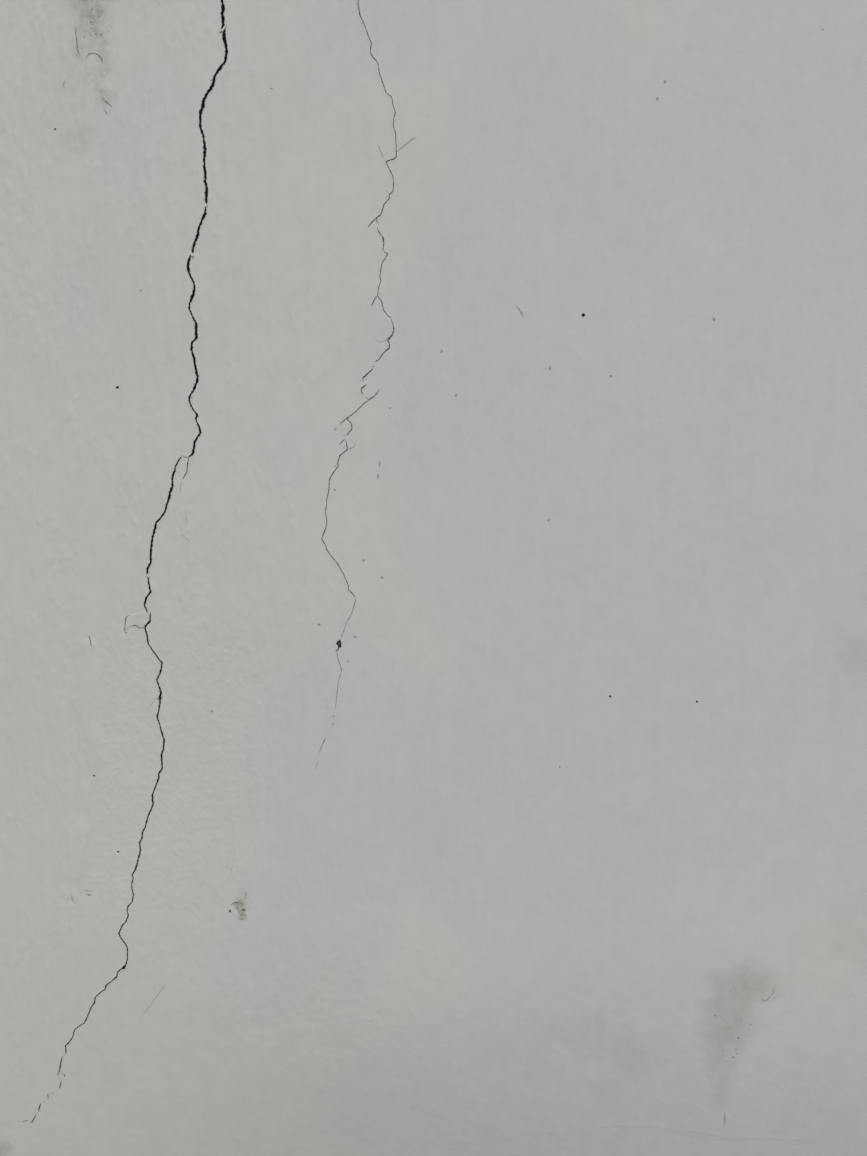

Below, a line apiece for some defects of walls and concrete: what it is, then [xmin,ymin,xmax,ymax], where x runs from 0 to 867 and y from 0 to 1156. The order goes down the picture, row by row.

crack [23,0,231,1124]
crack [319,0,414,709]